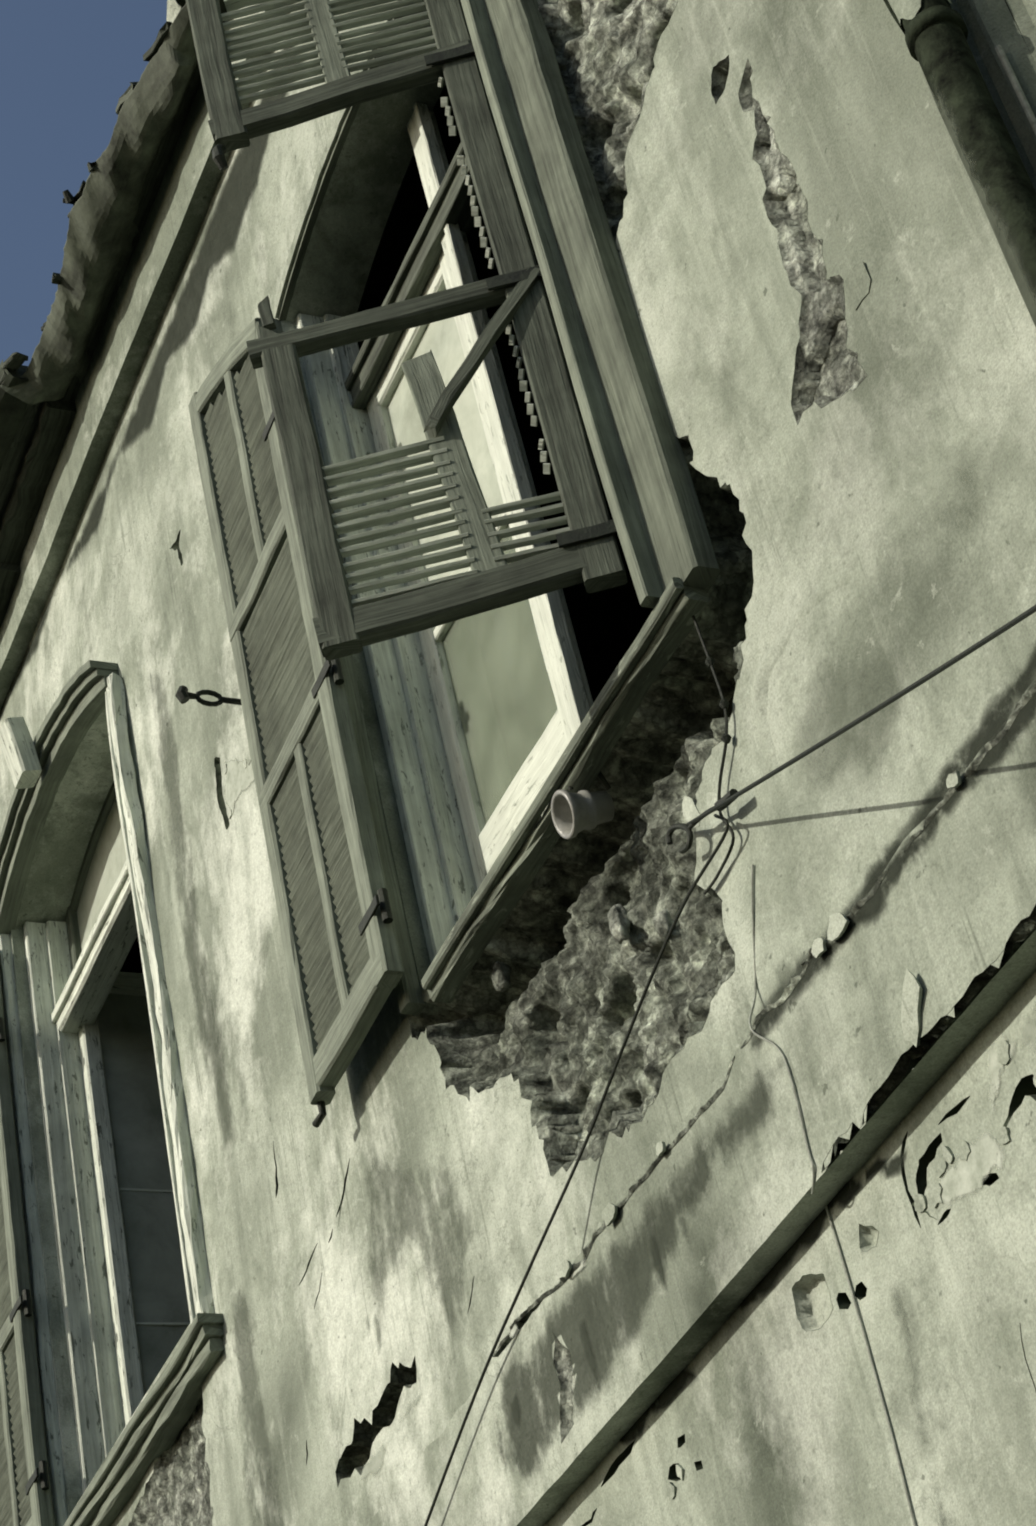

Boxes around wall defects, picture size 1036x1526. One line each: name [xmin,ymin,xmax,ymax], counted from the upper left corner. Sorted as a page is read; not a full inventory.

spalling [537,0,678,253]
spalling [711,55,871,425]
spalling [408,435,754,1177]
damp [753,649,1036,1045]
spalling [821,904,1036,1173]
crack [900,1096,970,1228]
peeling [914,1037,1015,1212]
spalling [335,1356,420,1487]
spalling [792,1273,833,1331]
crack [1020,1325,1036,1390]